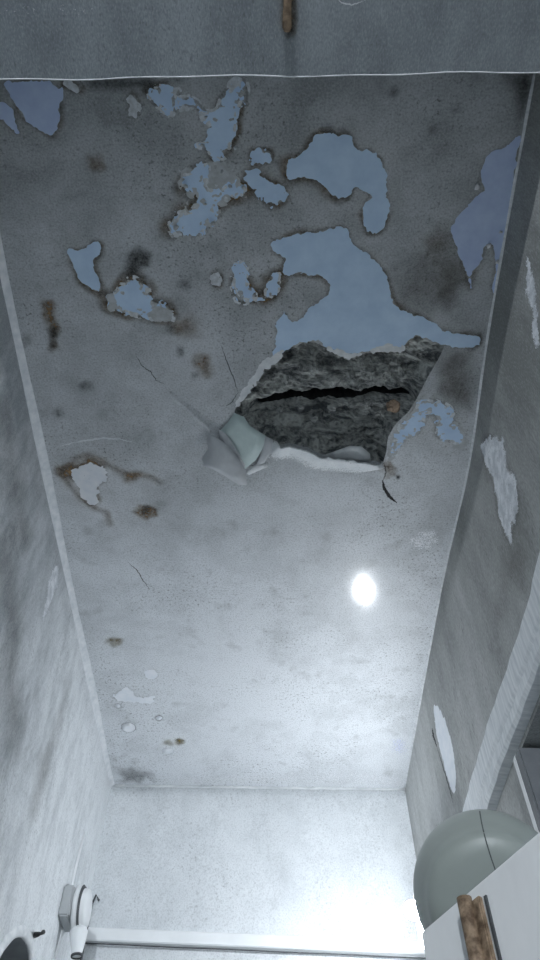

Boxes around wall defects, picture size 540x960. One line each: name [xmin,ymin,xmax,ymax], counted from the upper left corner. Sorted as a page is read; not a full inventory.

peeling [0,80,79,135]
peeling [126,76,390,243]
peeling [451,135,521,293]
peeling [67,241,177,323]
corrosion [43,301,59,347]
spalling [202,226,519,544]
peeling [60,455,108,505]
corrosion [135,506,157,519]
crack [382,465,397,503]
peeling [432,705,456,802]